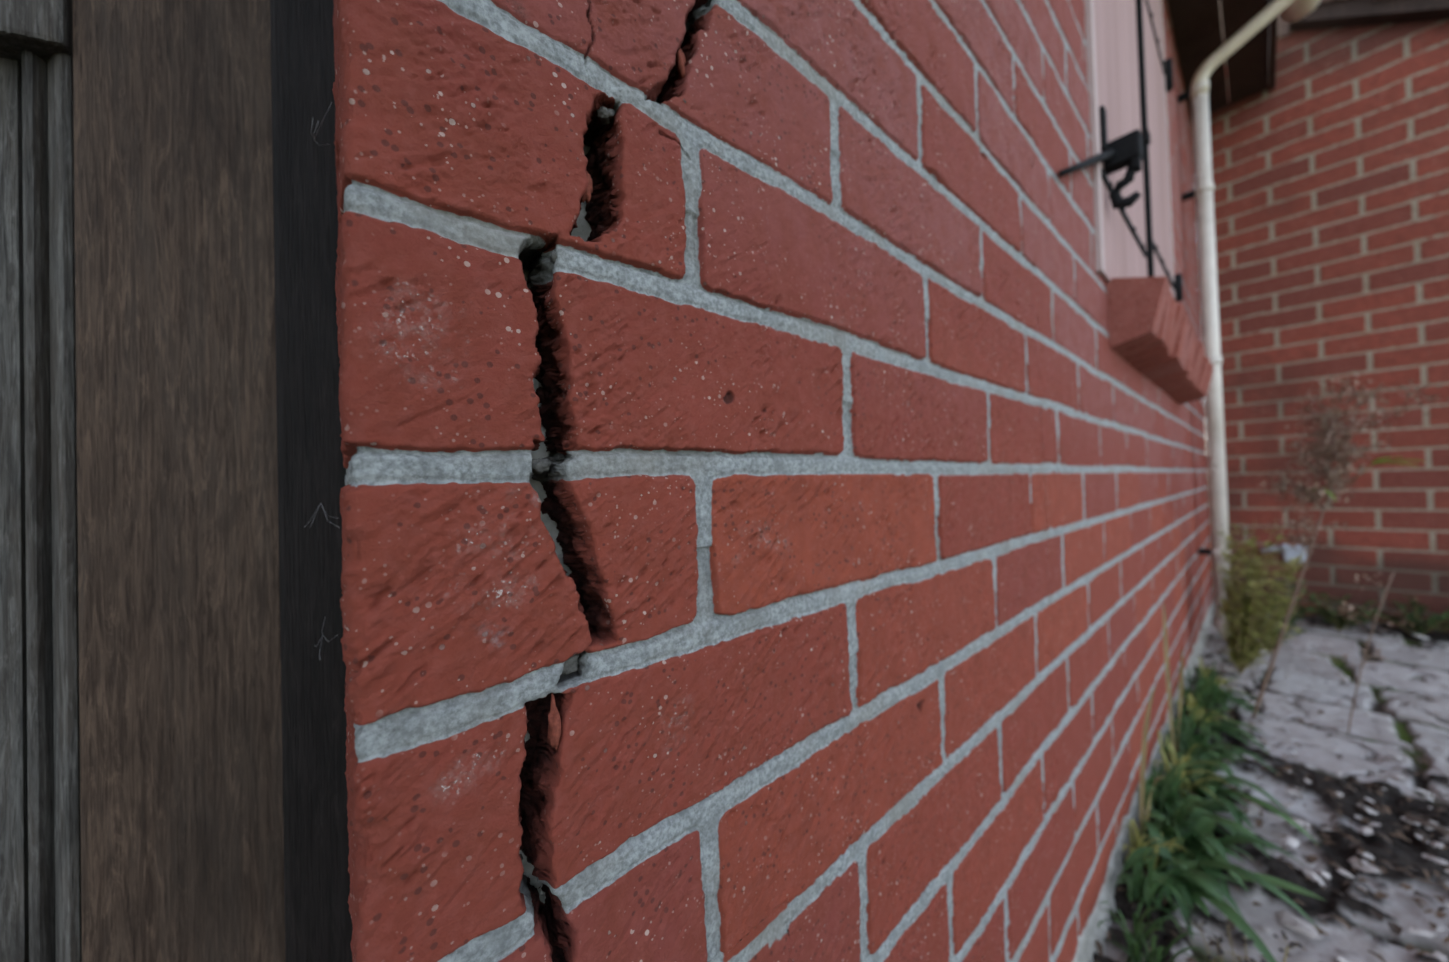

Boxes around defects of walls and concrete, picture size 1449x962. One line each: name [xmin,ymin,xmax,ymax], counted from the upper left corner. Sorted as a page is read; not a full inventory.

crack [516,0,717,962]